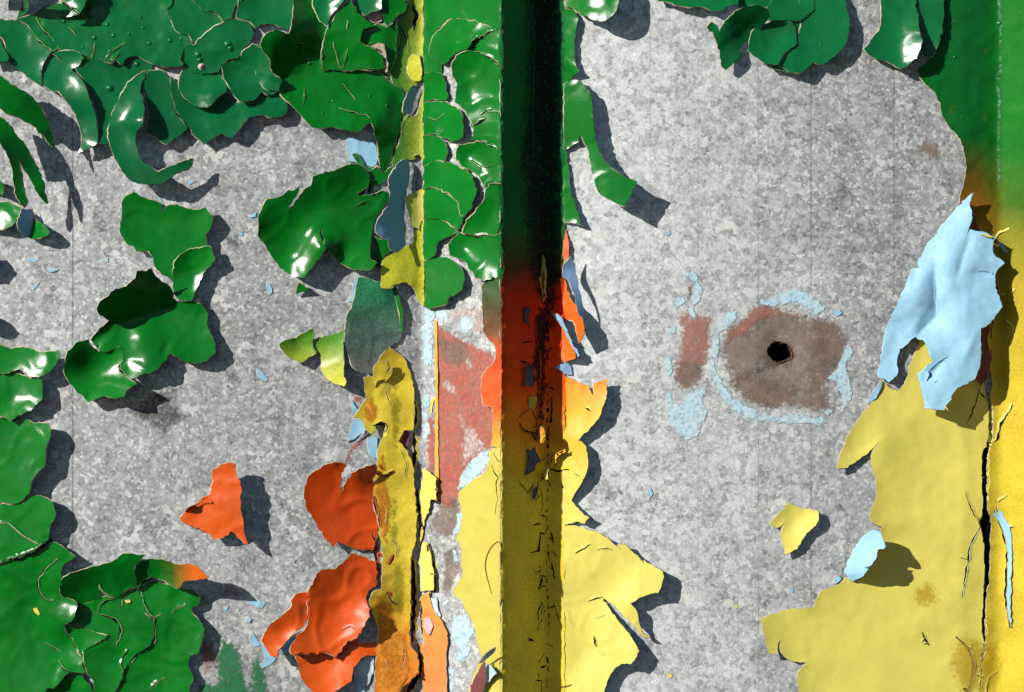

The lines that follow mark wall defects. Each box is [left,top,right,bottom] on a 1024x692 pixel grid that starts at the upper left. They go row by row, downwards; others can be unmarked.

peeling [656,0,850,75]
crack [982,227,1010,242]
peeling [0,0,664,692]
corrosion [675,313,712,387]
corrosion [724,305,844,411]
peeling [760,0,1024,692]
crack [978,268,1016,335]
crack [921,386,1014,692]